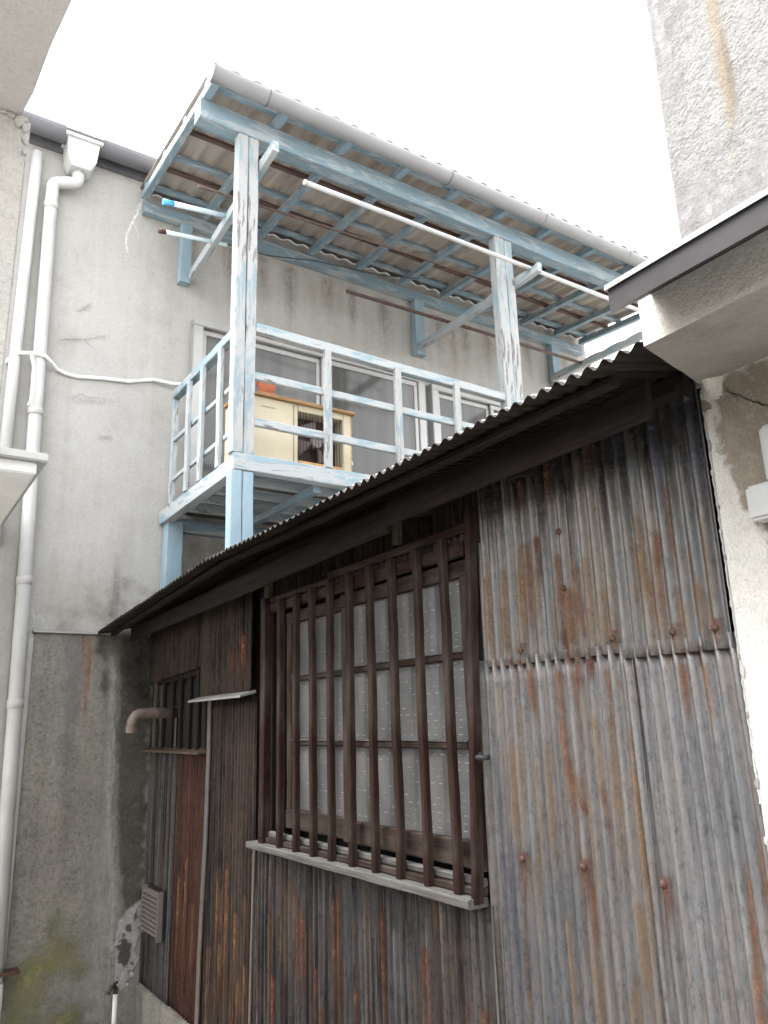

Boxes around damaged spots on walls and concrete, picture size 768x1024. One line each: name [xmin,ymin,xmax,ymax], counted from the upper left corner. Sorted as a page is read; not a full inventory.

corrosion [518,537,543,625]
spalling [700,390,761,804]
corrosion [507,644,535,812]
corrosion [555,672,589,812]
corrosion [679,646,710,712]
damp [80,636,152,1024]
peeling [113,901,141,990]
corrosion [747,872,765,1024]